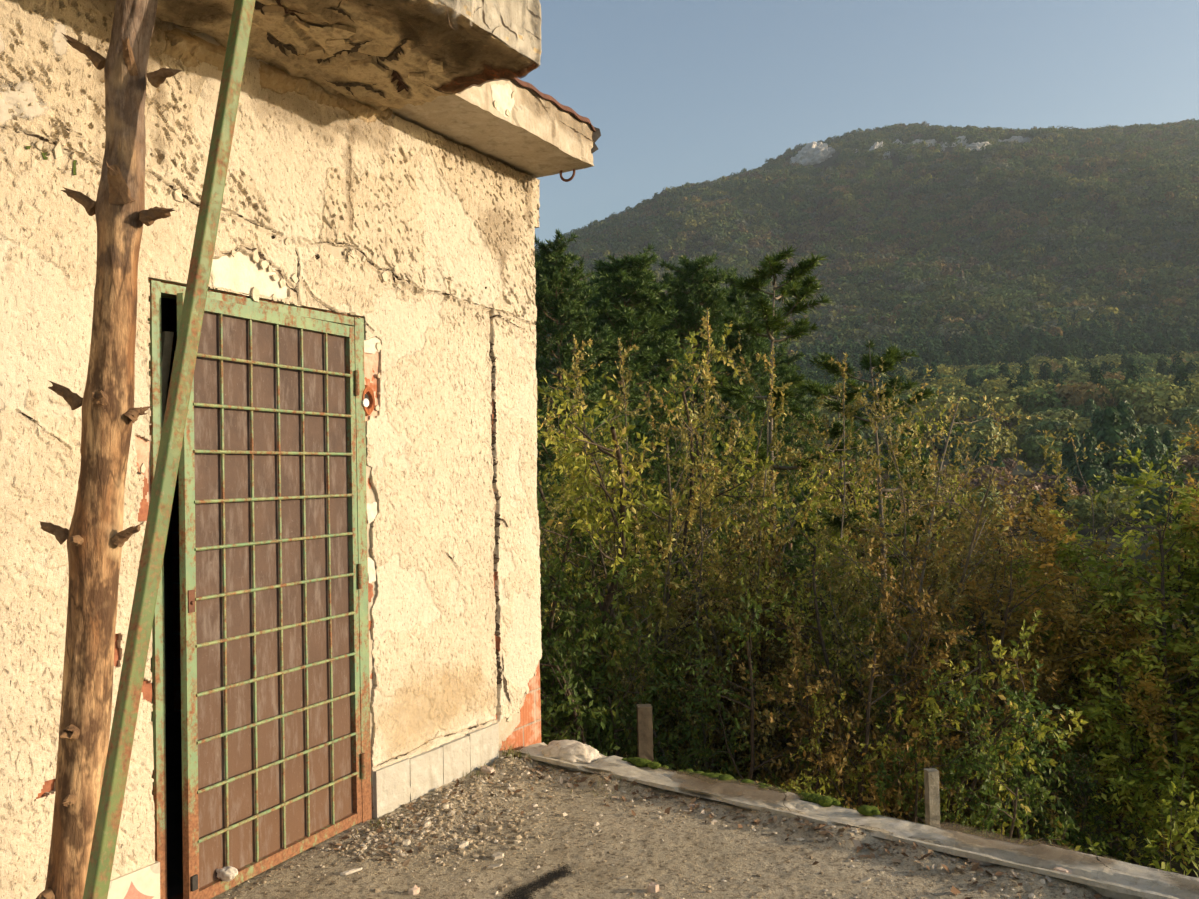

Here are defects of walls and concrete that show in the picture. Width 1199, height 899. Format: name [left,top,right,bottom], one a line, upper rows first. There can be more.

crack [254,0,453,100]
crack [447,0,542,43]
crack [0,123,101,168]
peeling [211,248,287,302]
spalling [362,337,382,426]
spalling [135,435,151,523]
crack [150,172,528,766]
spalling [142,680,152,704]
spalling [495,660,541,751]